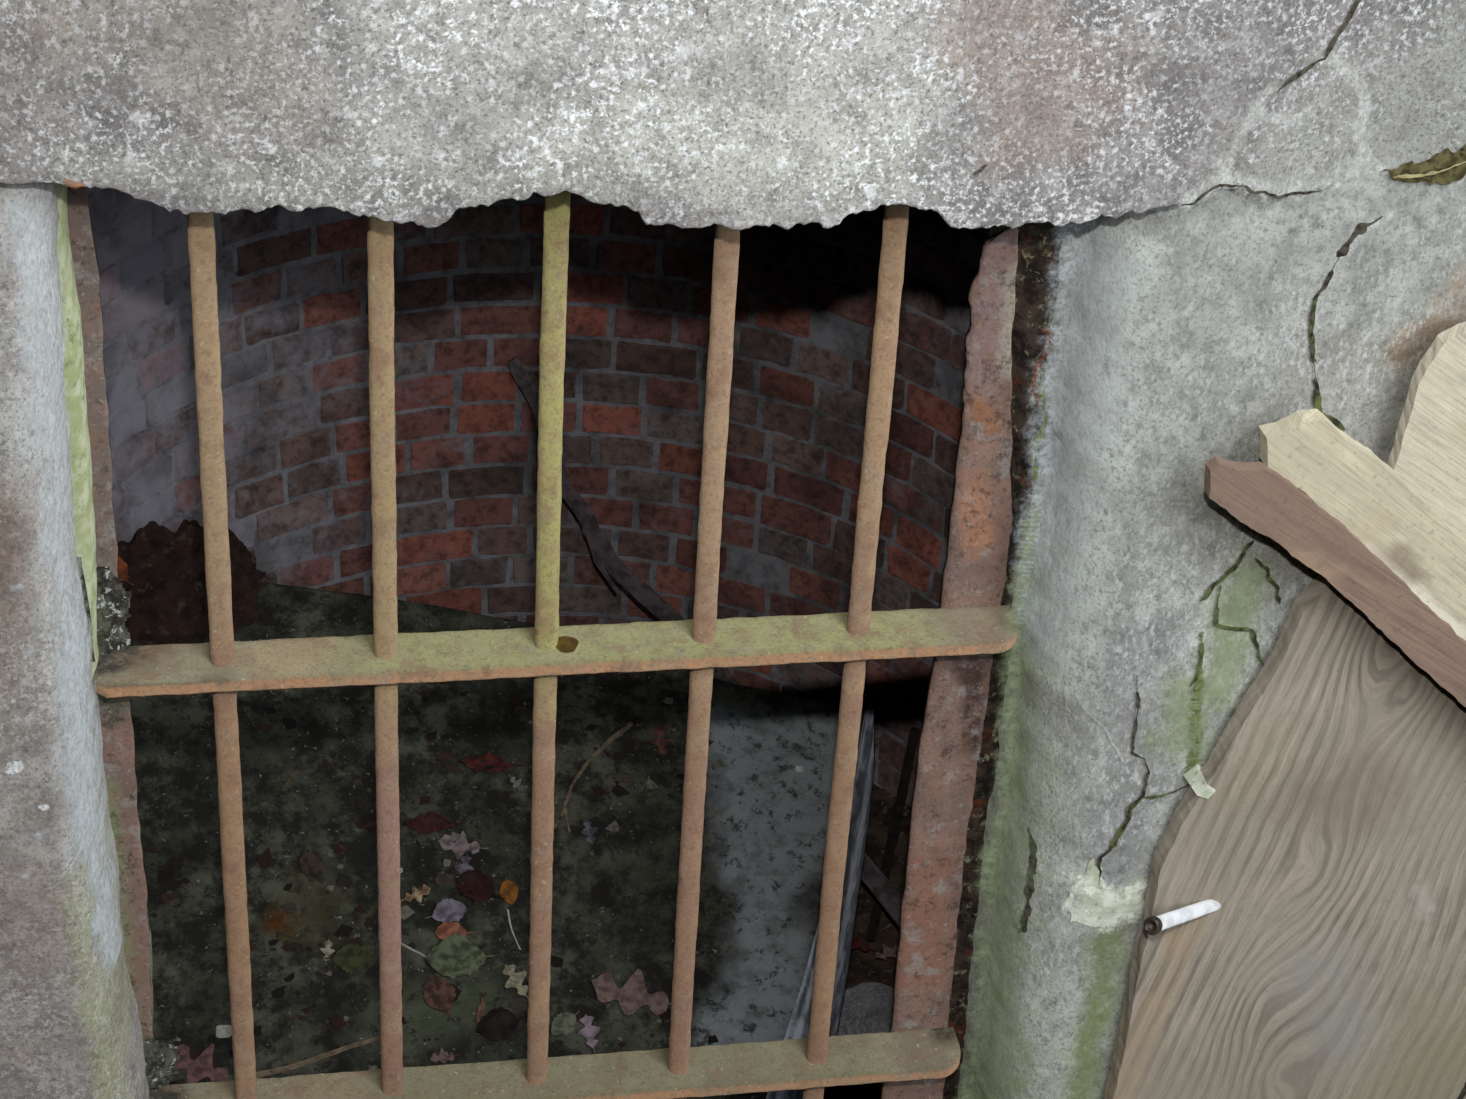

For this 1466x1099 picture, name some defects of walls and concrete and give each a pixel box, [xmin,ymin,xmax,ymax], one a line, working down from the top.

crack [1180,0,1390,208]
crack [1309,211,1395,431]
leakage [10,206,121,963]
rust [556,636,579,653]
leakage [966,235,1127,1099]
crack [1190,539,1281,687]
crack [1018,827,1037,933]
crack [1097,675,1190,885]